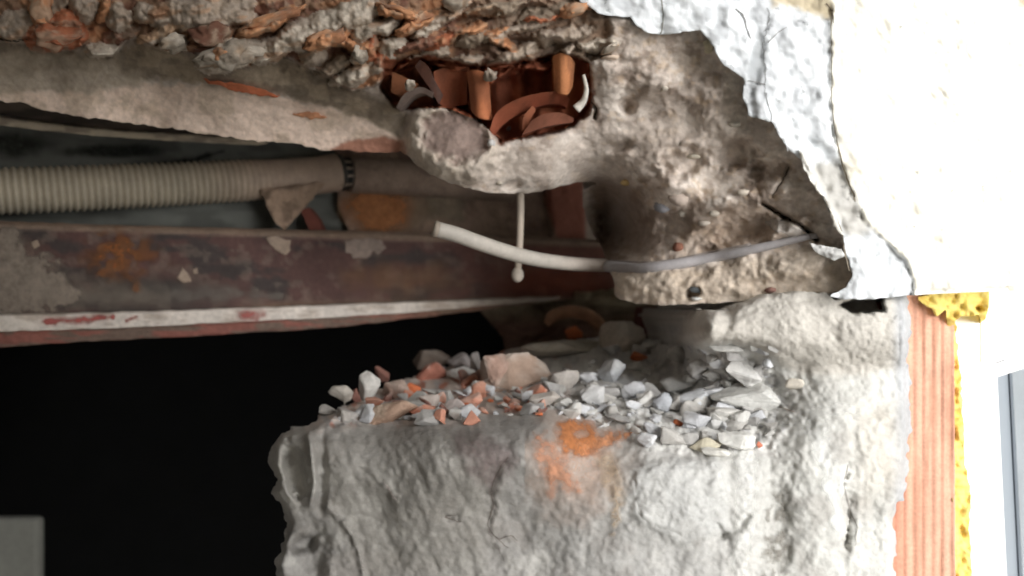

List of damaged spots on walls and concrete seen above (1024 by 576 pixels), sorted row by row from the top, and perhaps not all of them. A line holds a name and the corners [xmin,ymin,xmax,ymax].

spalling [0,0,853,306]
rust [516,271,599,295]
crack [736,8,816,241]
crack [824,197,850,271]